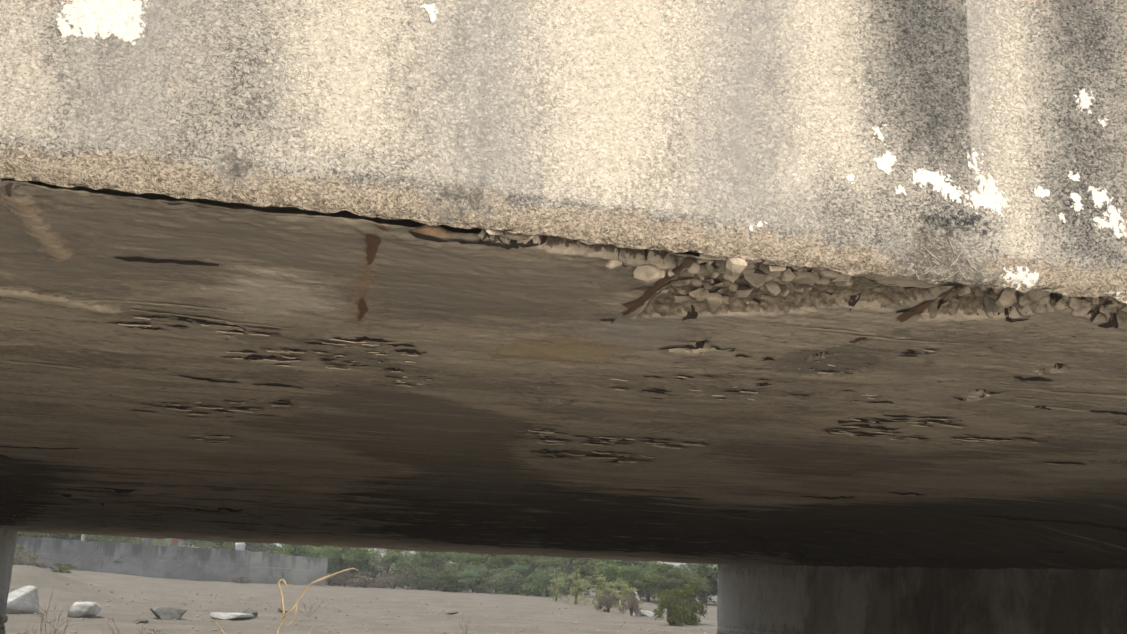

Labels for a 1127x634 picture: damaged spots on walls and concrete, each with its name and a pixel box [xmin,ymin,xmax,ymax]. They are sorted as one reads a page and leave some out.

peeling [54,0,149,45]
peeling [872,125,897,175]
crack [5,183,331,219]
peeling [895,148,1010,220]
peeling [1034,186,1050,198]
peeling [1058,171,1127,238]
spalling [478,229,1127,328]
leakage [221,389,551,502]
leakage [702,437,1122,480]